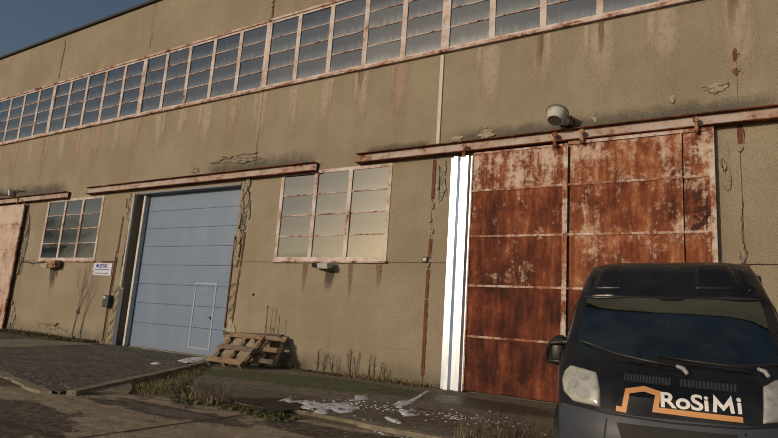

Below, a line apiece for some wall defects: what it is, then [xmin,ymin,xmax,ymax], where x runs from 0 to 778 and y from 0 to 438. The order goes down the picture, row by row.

damp [476,45,500,101]
damp [583,22,613,82]
damp [646,8,678,62]
corrosion [732,48,740,76]
damp [723,0,753,61]
spalling [208,152,262,164]
corrosion [736,125,745,152]
spalling [233,178,252,267]
corrosion [690,188,711,231]
crack [741,199,778,265]
corrosion [6,205,30,324]
corrosion [421,160,437,377]